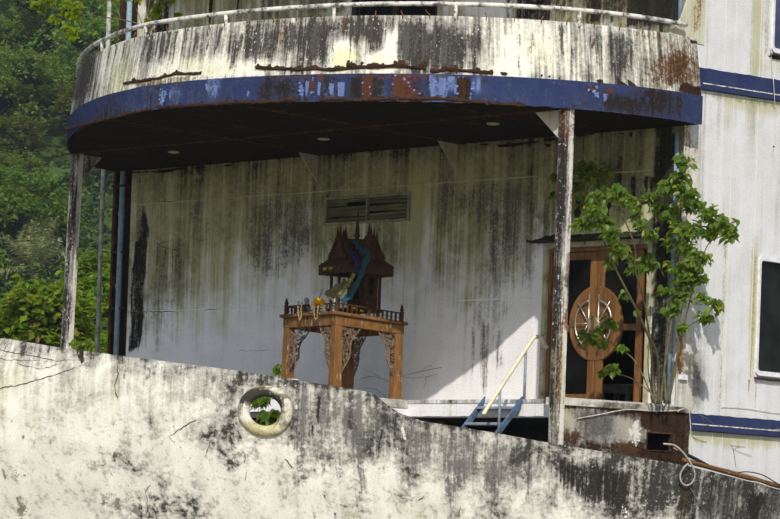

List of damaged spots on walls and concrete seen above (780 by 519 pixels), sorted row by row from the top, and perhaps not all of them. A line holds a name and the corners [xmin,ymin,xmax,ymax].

water stain [142,0,223,71]
peeling [298,77,345,97]
peeling [361,75,371,99]
rust [255,60,508,76]
peeling [392,74,480,101]
water stain [398,20,481,66]
rust [659,39,701,95]
water stain [128,211,149,352]
water stain [629,133,675,403]
crack [0,349,81,389]
rust [612,412,686,465]
water stain [555,457,632,518]